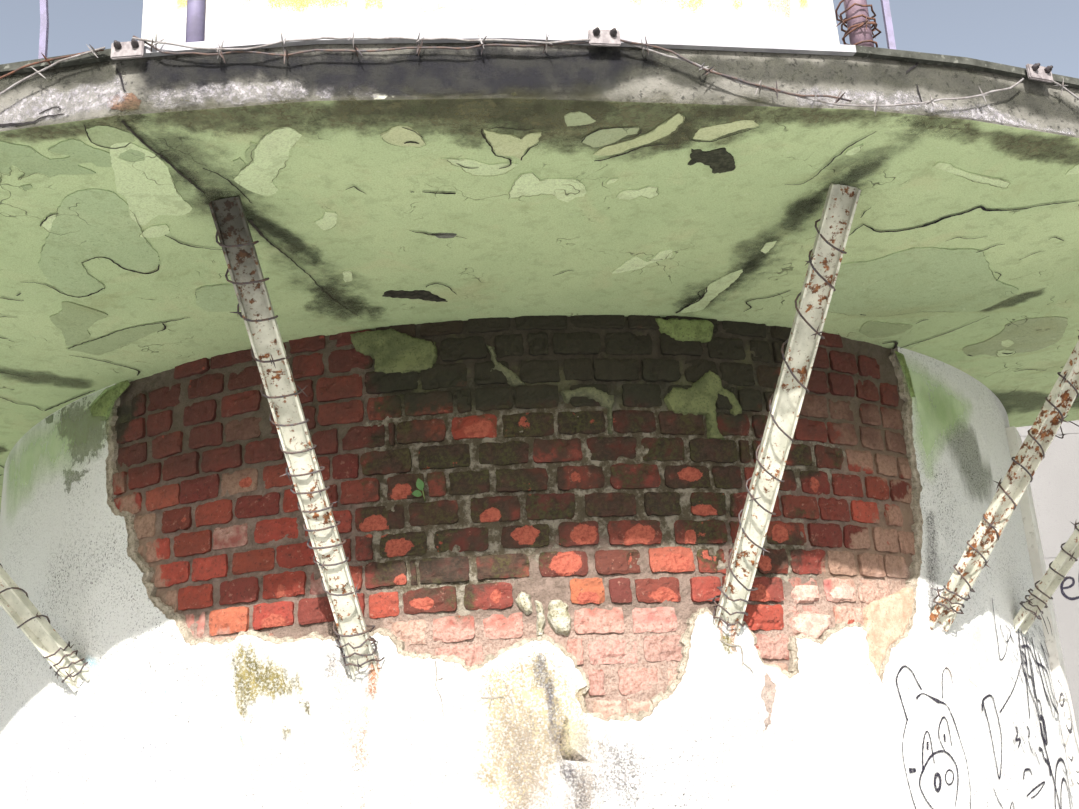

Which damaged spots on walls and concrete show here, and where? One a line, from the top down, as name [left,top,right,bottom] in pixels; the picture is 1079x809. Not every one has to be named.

peeling [0,126,192,238]
crack [0,106,361,317]
damp [314,278,379,314]
damp [0,43,1079,266]
spalling [688,120,759,174]
damp [730,236,771,286]
crack [850,201,1075,281]
flaking render [45,349,341,646]
flaking render [283,269,792,722]
flaking render [742,247,1043,731]
damp [231,643,309,718]
damp [478,652,641,809]